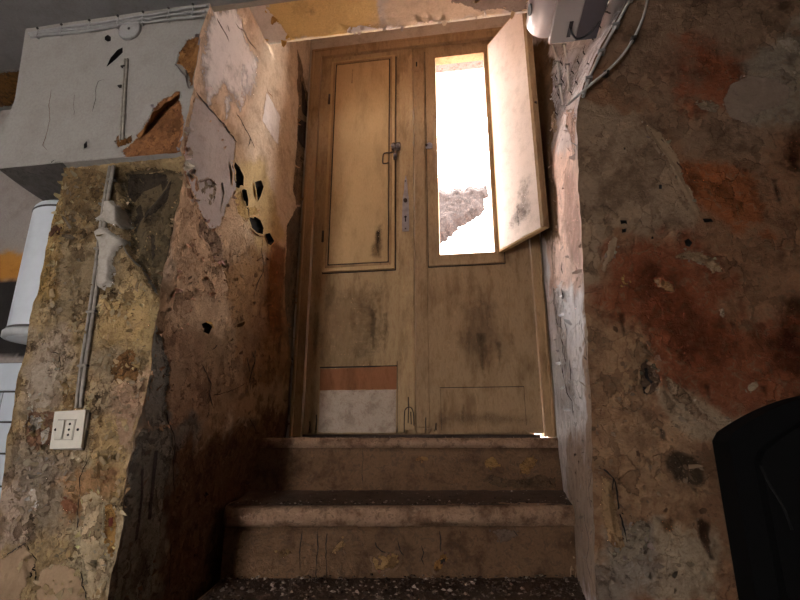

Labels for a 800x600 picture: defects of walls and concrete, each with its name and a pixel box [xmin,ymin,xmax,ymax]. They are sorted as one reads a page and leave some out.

peeling [347,19,451,35]
flaking render [451,0,528,19]
peeling [695,75,793,124]
flaking render [0,33,260,600]
peeling [553,284,577,412]
peeling [637,356,733,435]